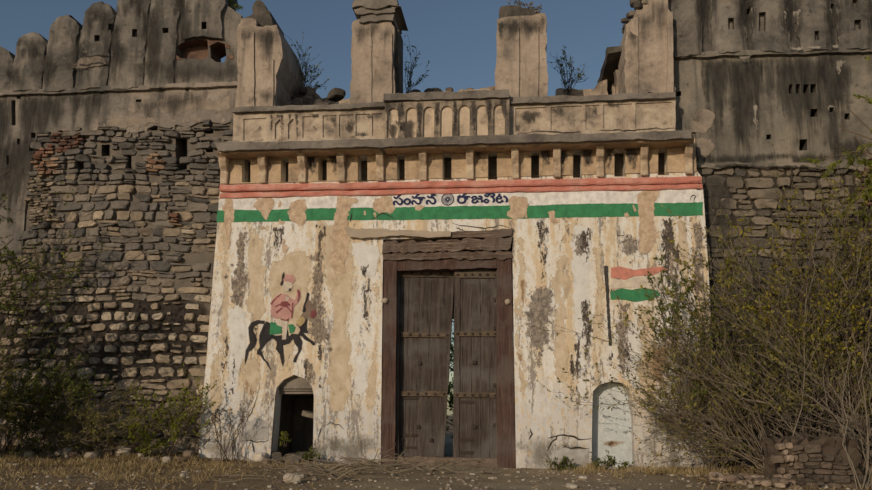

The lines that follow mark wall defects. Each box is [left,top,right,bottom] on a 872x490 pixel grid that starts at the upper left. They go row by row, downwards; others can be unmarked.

water stain [0,94,101,211]
water stain [124,0,193,78]
water stain [386,102,423,138]
water stain [470,99,507,130]
water stain [698,0,865,163]
peeling [196,195,395,440]
peeling [507,196,655,420]
peeling [621,190,705,348]